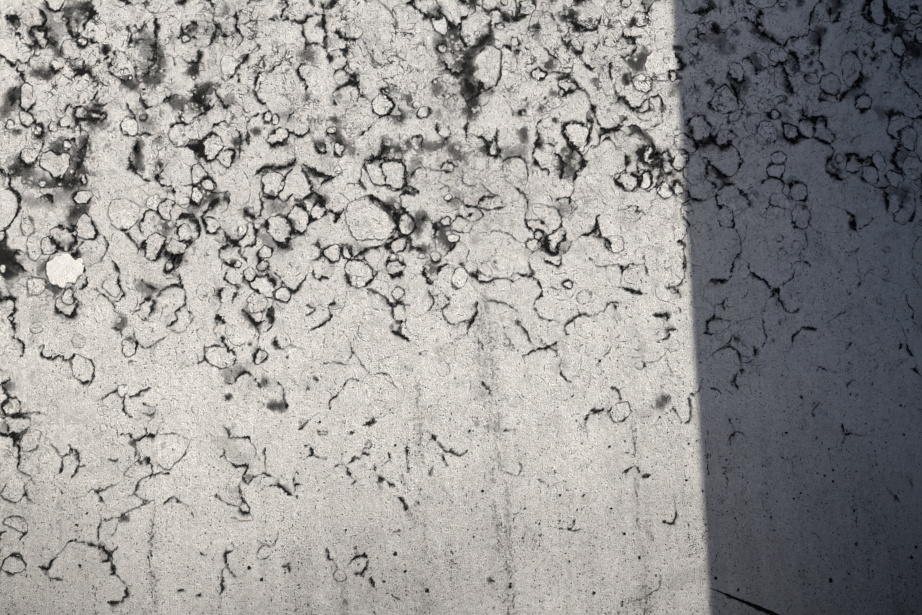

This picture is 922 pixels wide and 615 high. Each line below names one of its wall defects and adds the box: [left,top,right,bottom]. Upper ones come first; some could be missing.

damp [448,20,477,118]
crack [0,0,690,399]
crack [648,0,922,423]
crack [0,376,64,581]
crack [52,444,85,498]
crack [108,403,194,517]
crack [214,425,301,546]
crack [298,343,409,532]
crack [585,386,622,421]
crack [102,543,133,606]
crack [177,543,236,596]
crack [326,547,400,600]